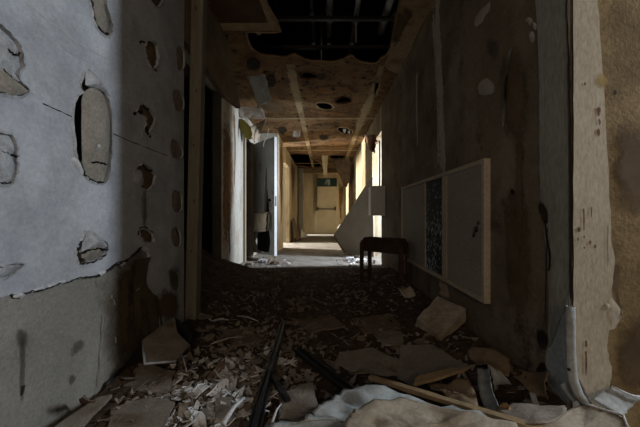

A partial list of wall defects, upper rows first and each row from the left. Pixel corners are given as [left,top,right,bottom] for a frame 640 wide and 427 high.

flaking render [88,0,114,39]
flaking render [0,23,30,99]
flaking render [139,38,160,72]
flaking render [70,67,113,186]
flaking render [133,103,157,138]
flaking render [0,129,20,188]
flaking render [74,230,109,268]
flaking render [0,262,27,282]
damp [18,331,26,399]